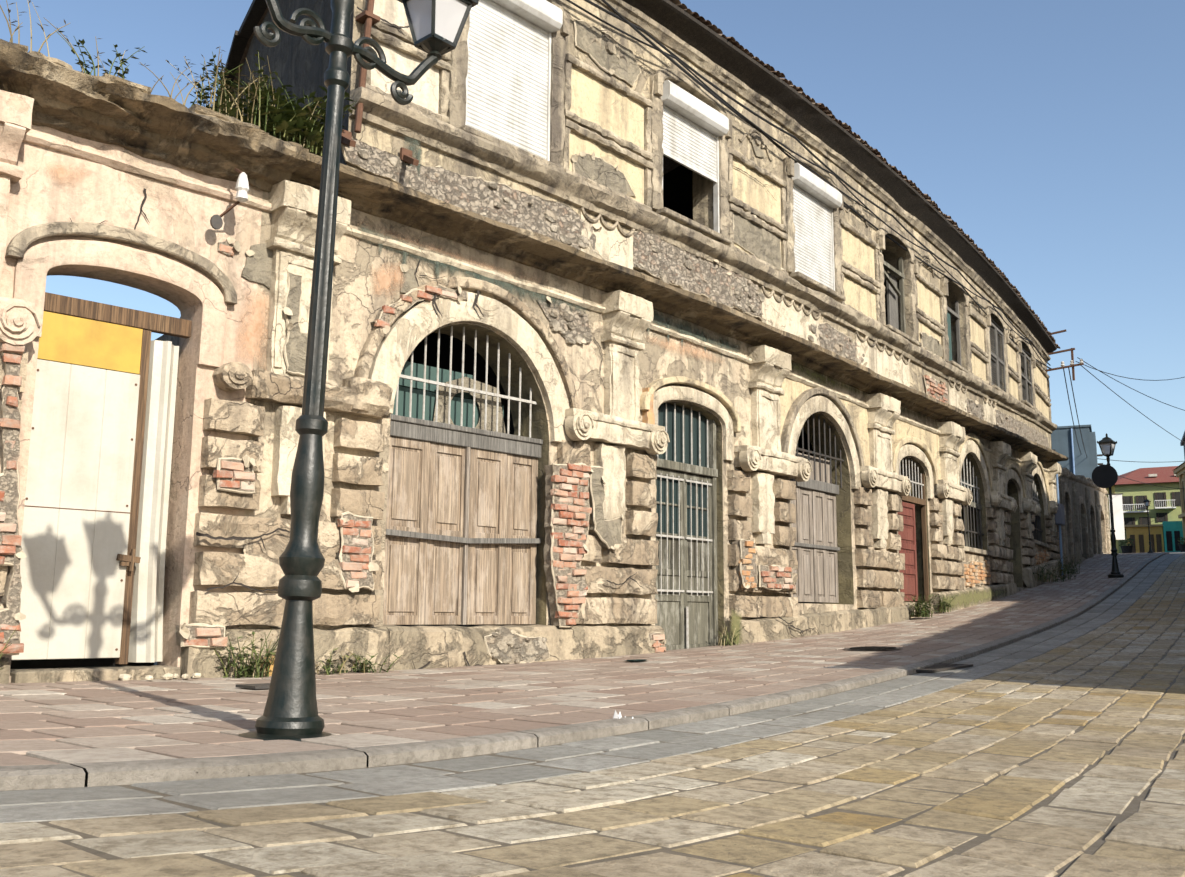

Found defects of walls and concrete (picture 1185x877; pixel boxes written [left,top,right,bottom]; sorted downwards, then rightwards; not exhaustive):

crack [134,188,150,230]
spalling [370,264,468,334]
spalling [0,342,27,655]
spalling [212,454,256,494]
spalling [484,462,624,664]
spalling [732,538,796,591]
spalling [957,560,991,587]
spalling [176,623,228,649]